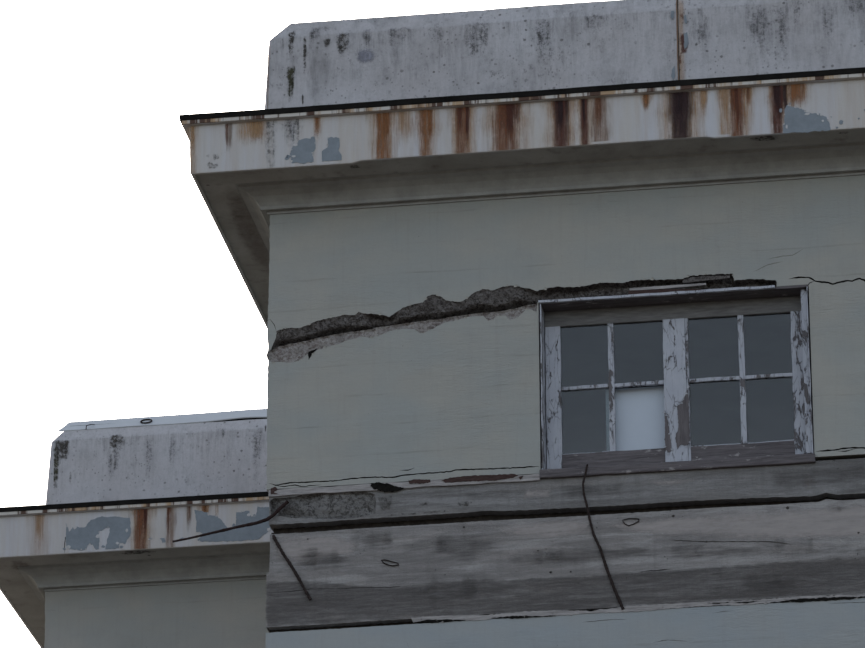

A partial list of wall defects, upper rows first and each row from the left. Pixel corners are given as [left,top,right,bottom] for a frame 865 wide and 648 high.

water stain [287,28,319,96]
rust [550,98,608,146]
rust [664,91,706,138]
rust [769,84,806,133]
peeling [779,103,843,134]
crack [756,250,865,290]
spalling [267,273,777,363]
peeling [662,386,691,455]
water stain [53,440,68,485]
peeling [63,516,131,551]
rust [134,509,148,549]
spalling [148,479,430,600]